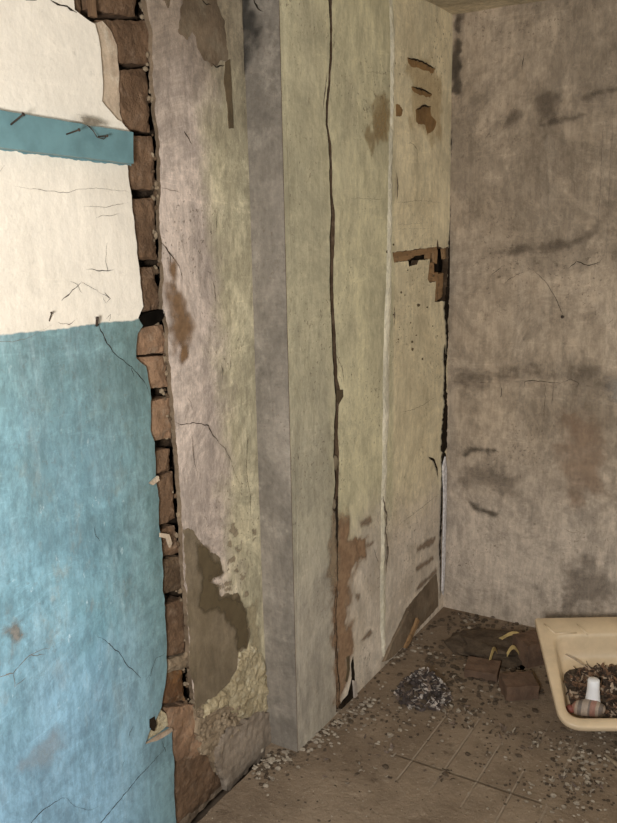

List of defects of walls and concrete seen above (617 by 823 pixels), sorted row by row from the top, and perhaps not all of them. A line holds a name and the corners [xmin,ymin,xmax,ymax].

spalling [407,57,435,73]
spalling [411,86,436,134]
crack [62,246,148,389]
crack [335,355,344,404]
flaking render [74,0,269,823]
crack [332,455,340,471]
crack [332,497,340,694]
spalling [336,656,358,709]
crack [31,741,170,823]